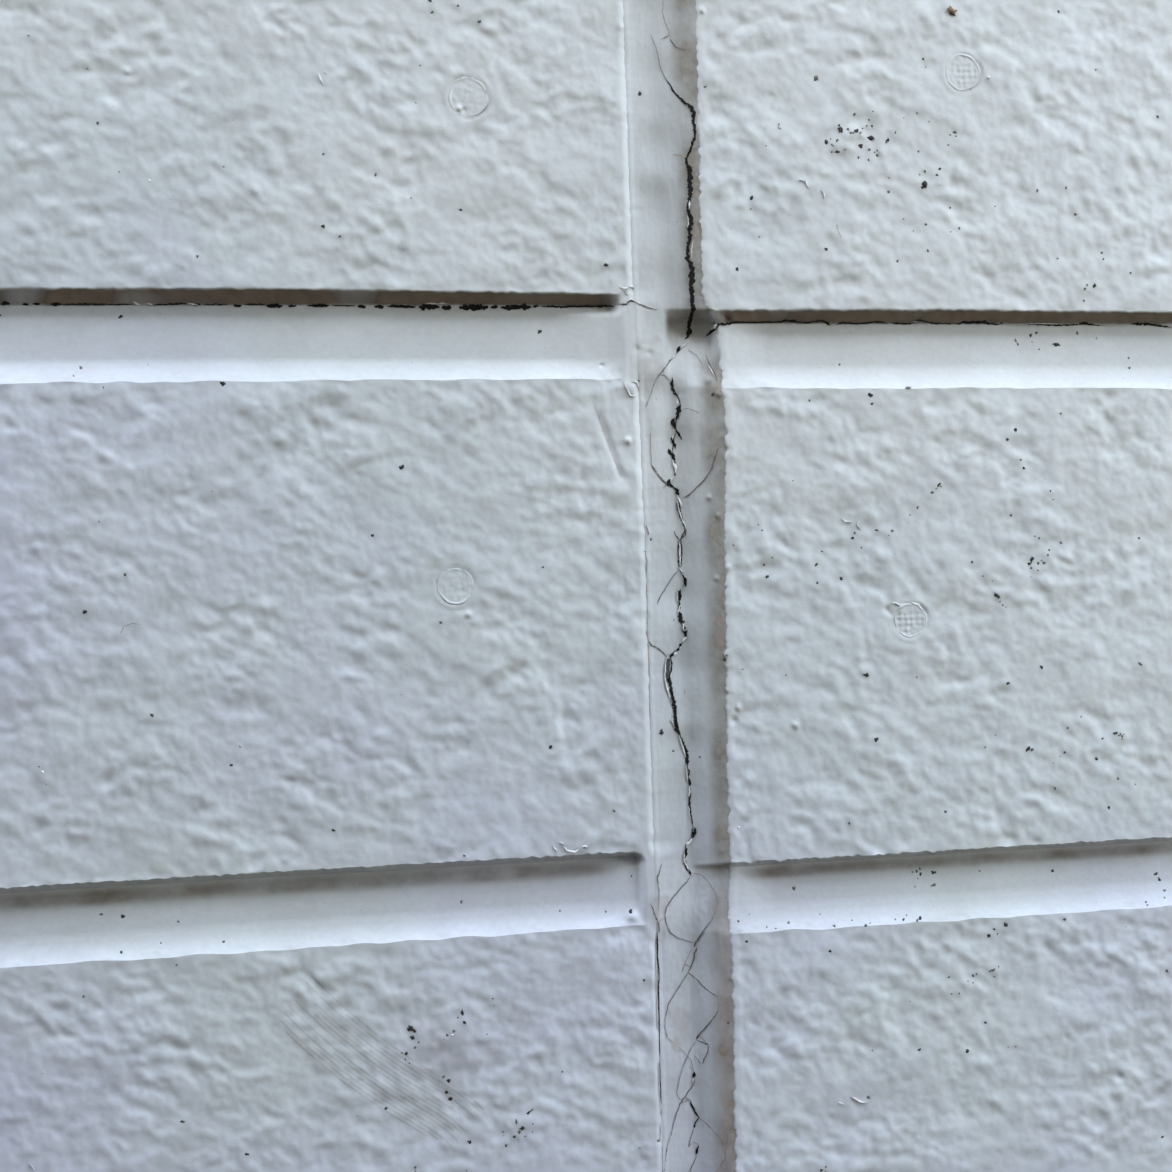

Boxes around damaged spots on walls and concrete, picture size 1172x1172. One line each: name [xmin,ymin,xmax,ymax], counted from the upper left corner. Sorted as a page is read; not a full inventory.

crack [644,2,1172,1172]